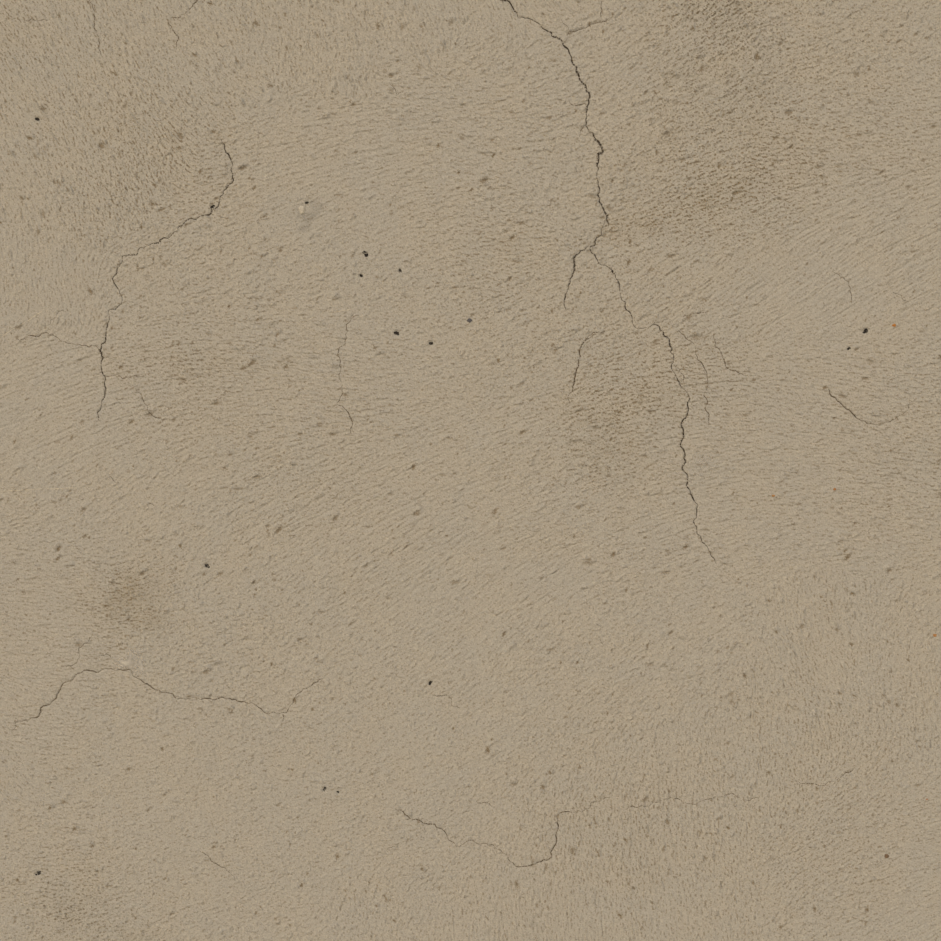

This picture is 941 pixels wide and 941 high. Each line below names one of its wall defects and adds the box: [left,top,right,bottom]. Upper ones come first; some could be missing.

crack [18,144,234,420]
crack [337,315,353,432]
crack [500,0,743,563]